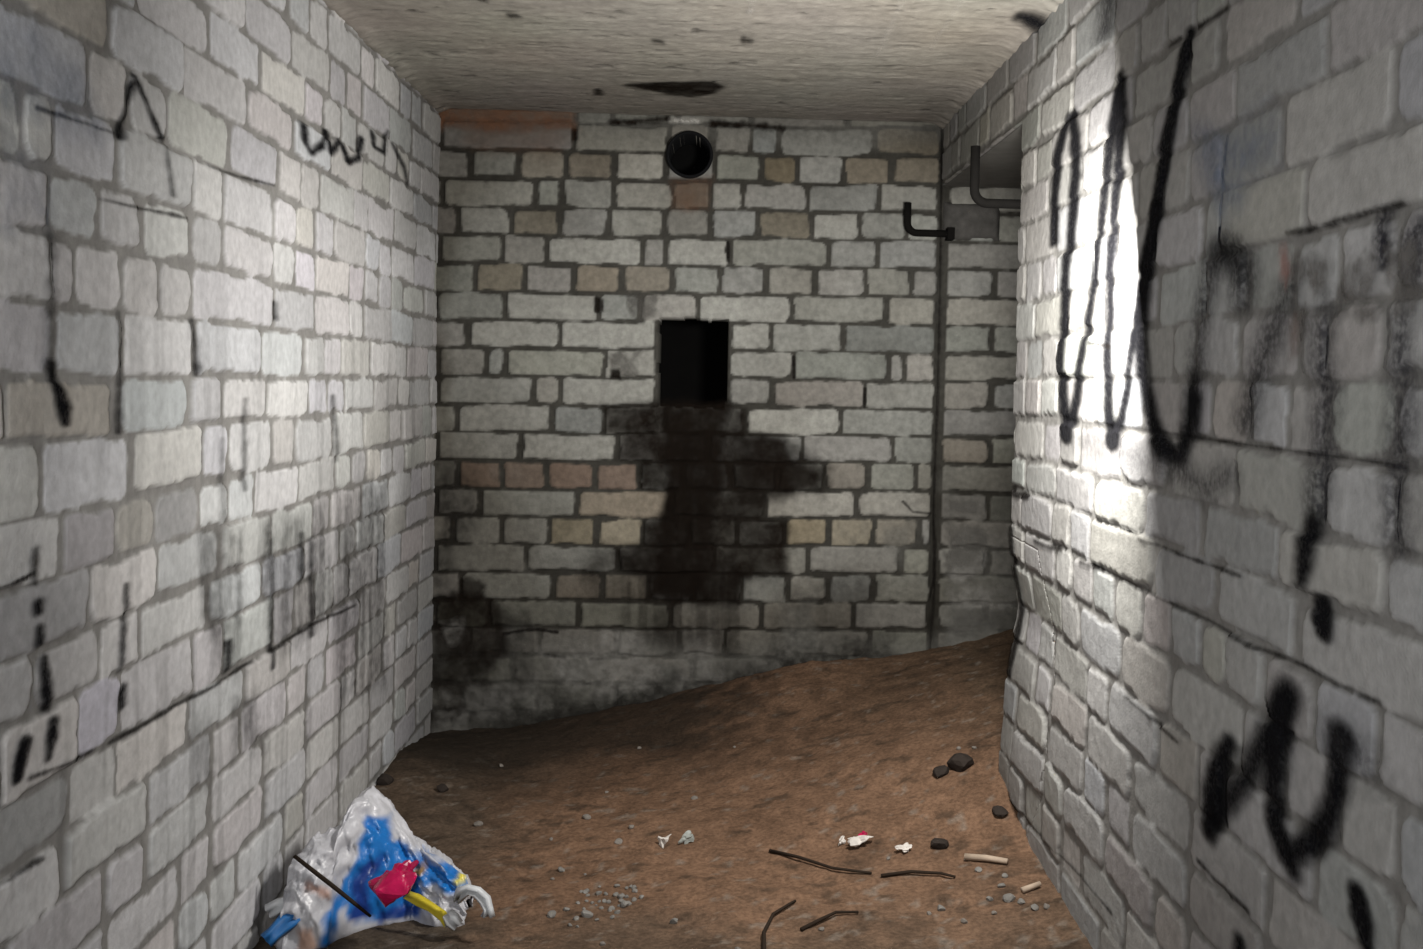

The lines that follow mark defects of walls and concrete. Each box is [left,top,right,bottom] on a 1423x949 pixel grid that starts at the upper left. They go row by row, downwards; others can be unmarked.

damp [660,405,725,608]